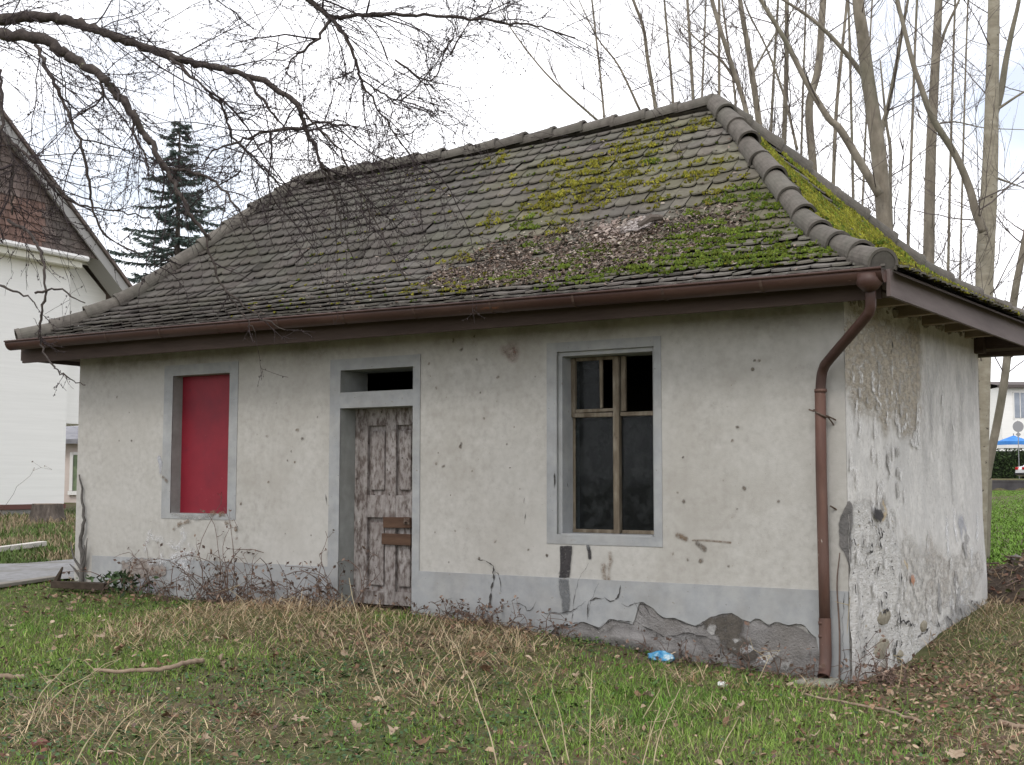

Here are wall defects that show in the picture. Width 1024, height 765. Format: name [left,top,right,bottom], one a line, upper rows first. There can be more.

flaking render [839,311,983,683]
leakage [559,579,570,613]
crack [443,559,721,653]
flaking render [552,603,819,677]